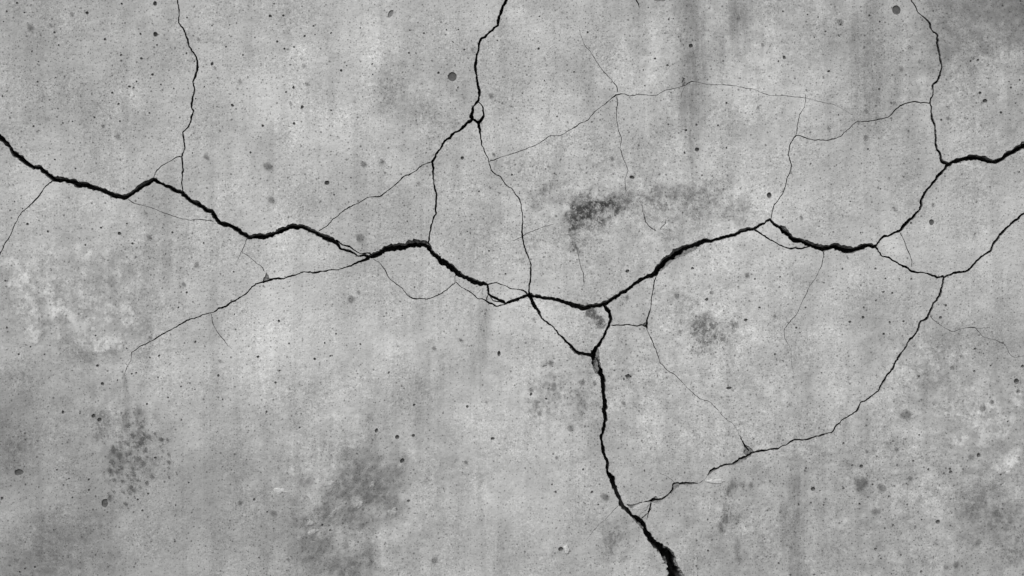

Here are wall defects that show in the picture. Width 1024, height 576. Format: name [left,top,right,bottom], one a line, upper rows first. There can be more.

crack [0,0,1024,358]
crack [528,297,698,576]
crack [707,213,1024,476]